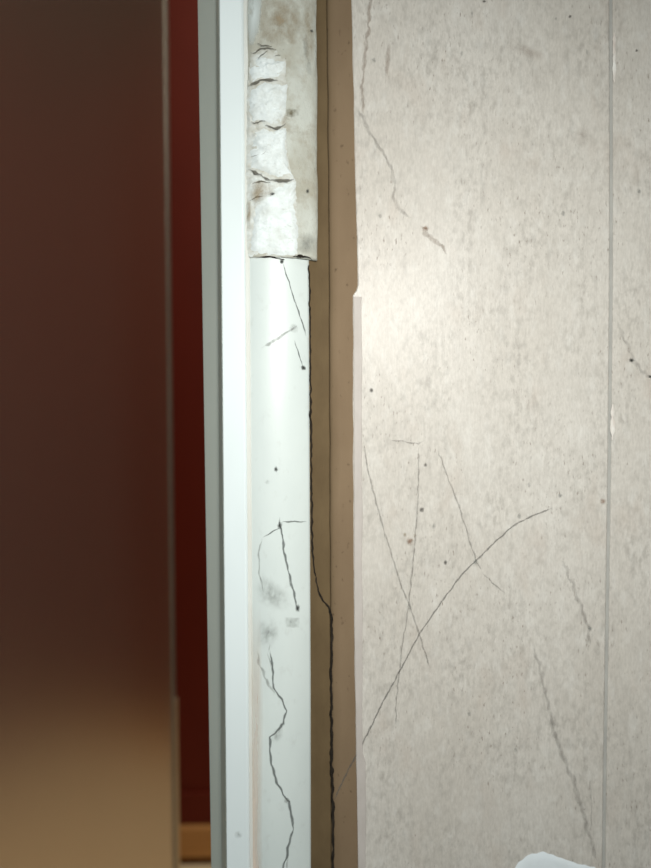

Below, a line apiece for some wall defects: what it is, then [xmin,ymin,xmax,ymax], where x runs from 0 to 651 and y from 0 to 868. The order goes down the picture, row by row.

flaking render [246,0,318,261]
crack [260,254,335,868]
spalling [515,852,595,868]